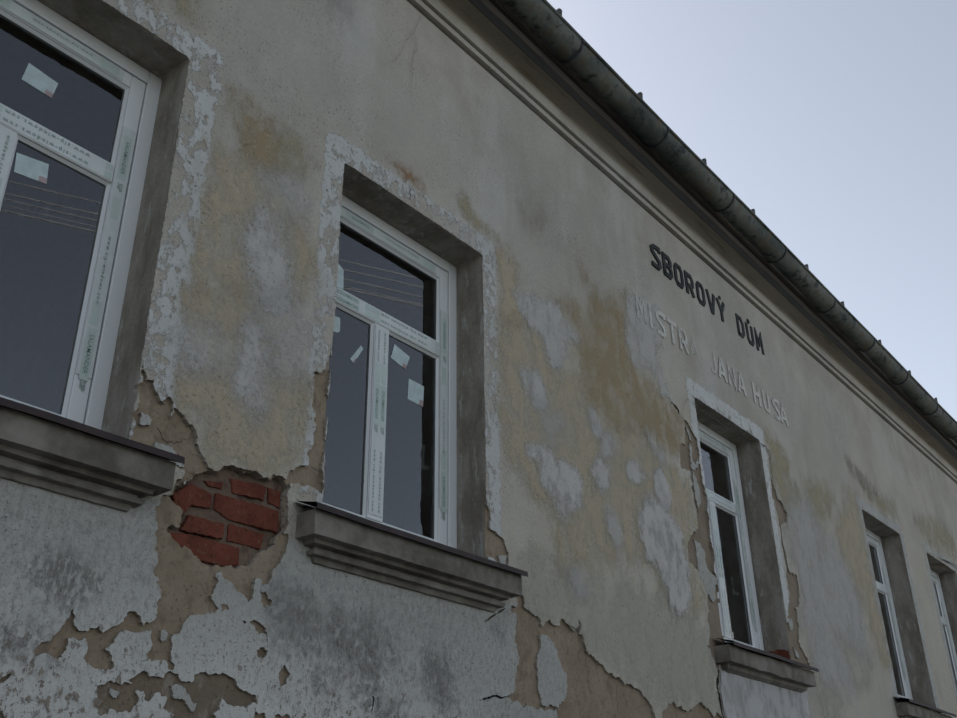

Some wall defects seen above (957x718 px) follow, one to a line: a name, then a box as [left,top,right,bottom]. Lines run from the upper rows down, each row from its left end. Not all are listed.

leakage [175,339,314,476]
spalling [0,0,509,718]
peeling [511,291,579,369]
peeling [524,407,617,521]
spalling [626,375,811,671]
spalling [505,595,723,718]